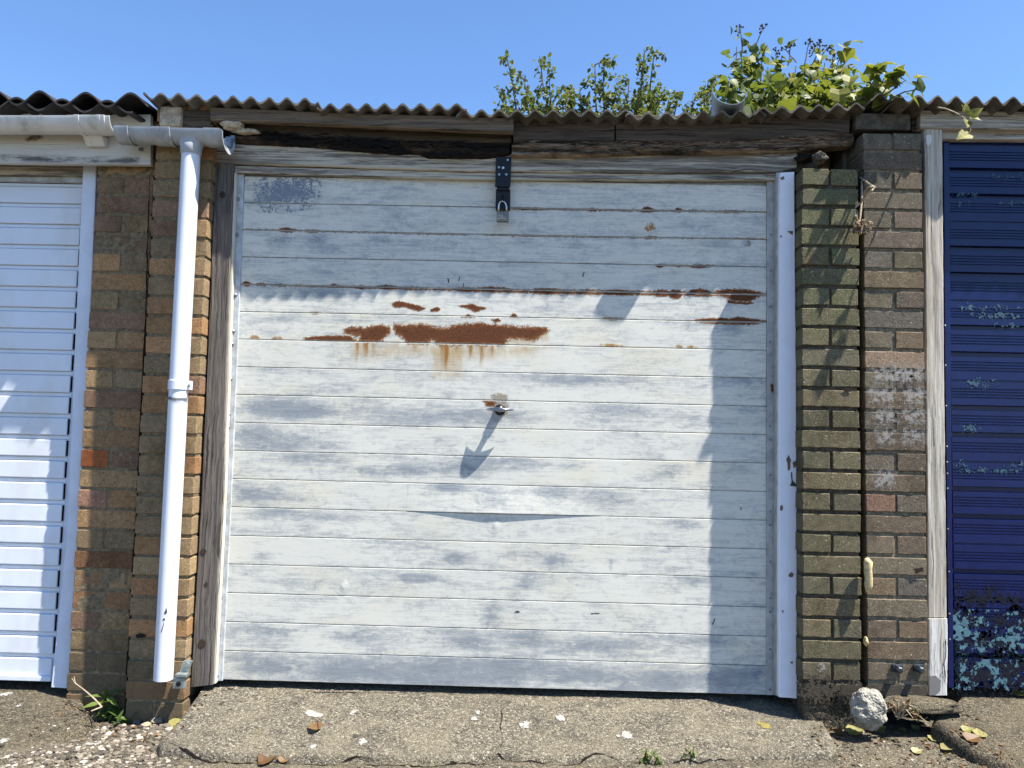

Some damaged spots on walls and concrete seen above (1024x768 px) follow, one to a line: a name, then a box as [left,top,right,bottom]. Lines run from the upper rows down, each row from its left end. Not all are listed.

corrosion [242,281,767,366]
peeling [959,303,1024,330]
peeling [929,582,1024,699]